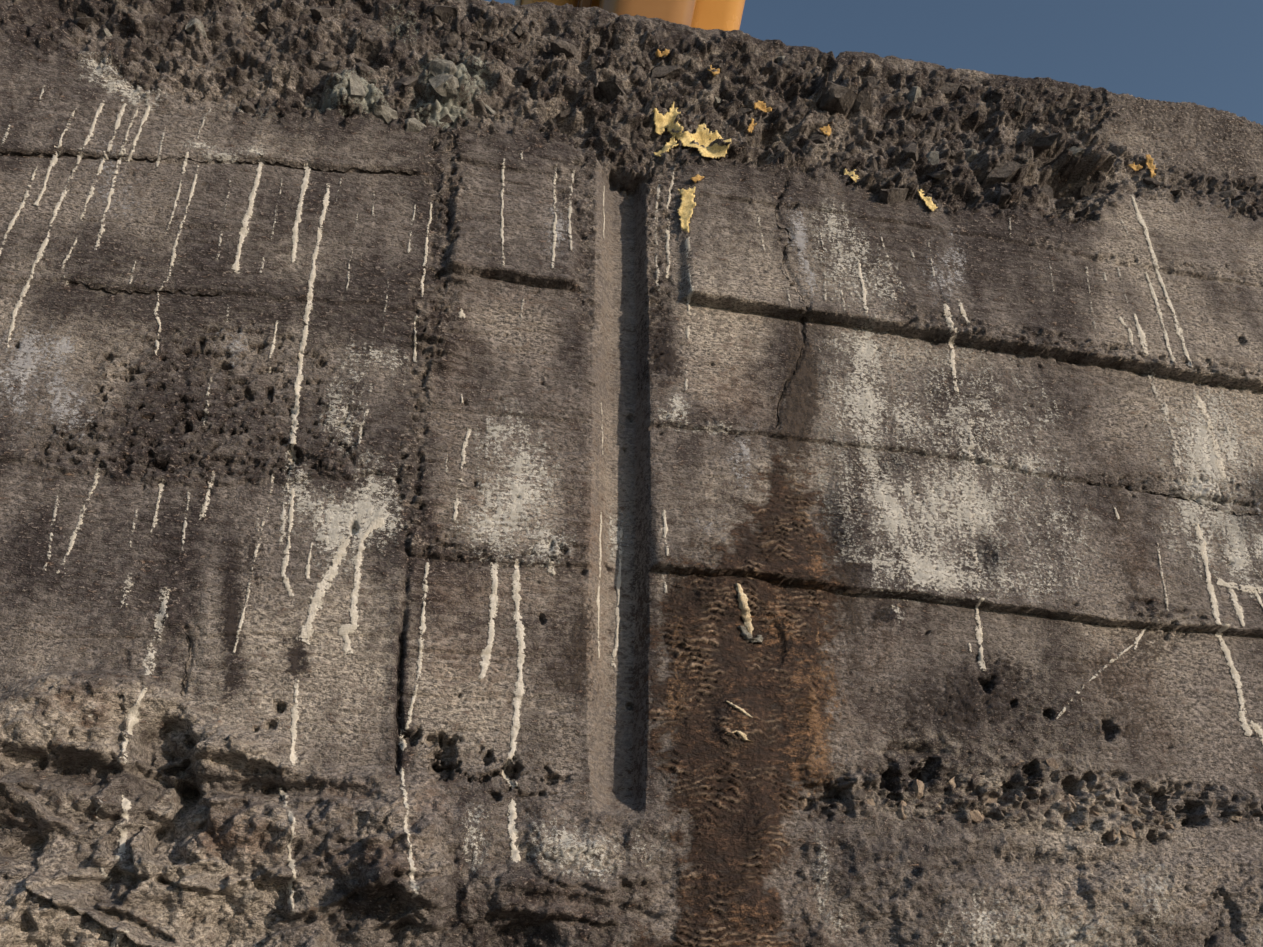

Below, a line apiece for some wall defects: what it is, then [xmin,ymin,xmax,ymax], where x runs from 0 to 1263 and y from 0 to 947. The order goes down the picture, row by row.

damp [0,51,167,439]
damp [117,587,171,764]
damp [153,109,265,355]
damp [291,160,313,262]
damp [217,178,419,766]
crack [394,633,403,772]
damp [445,407,667,881]
spalling [0,0,1263,578]
corrosion [629,308,892,947]
crack [775,178,808,428]
spalling [803,647,1263,851]
damp [1085,266,1263,745]